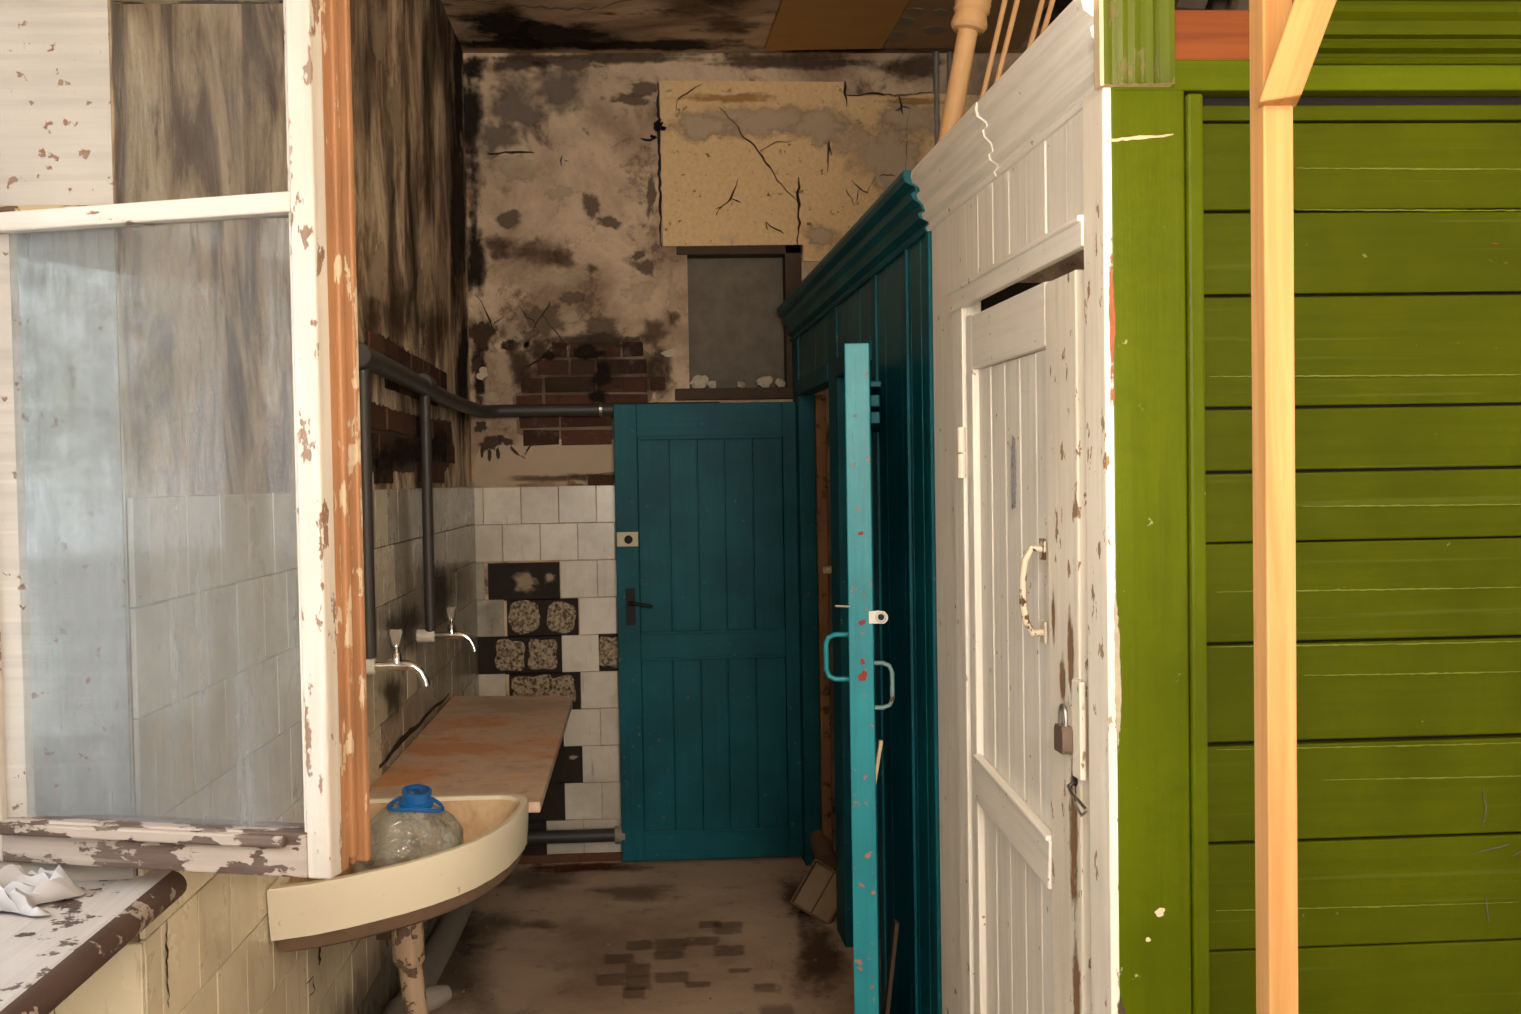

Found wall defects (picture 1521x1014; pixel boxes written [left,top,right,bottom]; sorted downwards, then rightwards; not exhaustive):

water stain [363,25,371,133]
crack [640,81,932,246]
water stain [365,0,942,462]
flaking render [476,323,676,446]
peeling [478,562,581,709]
peeling [597,634,618,671]
peeling [522,736,583,855]